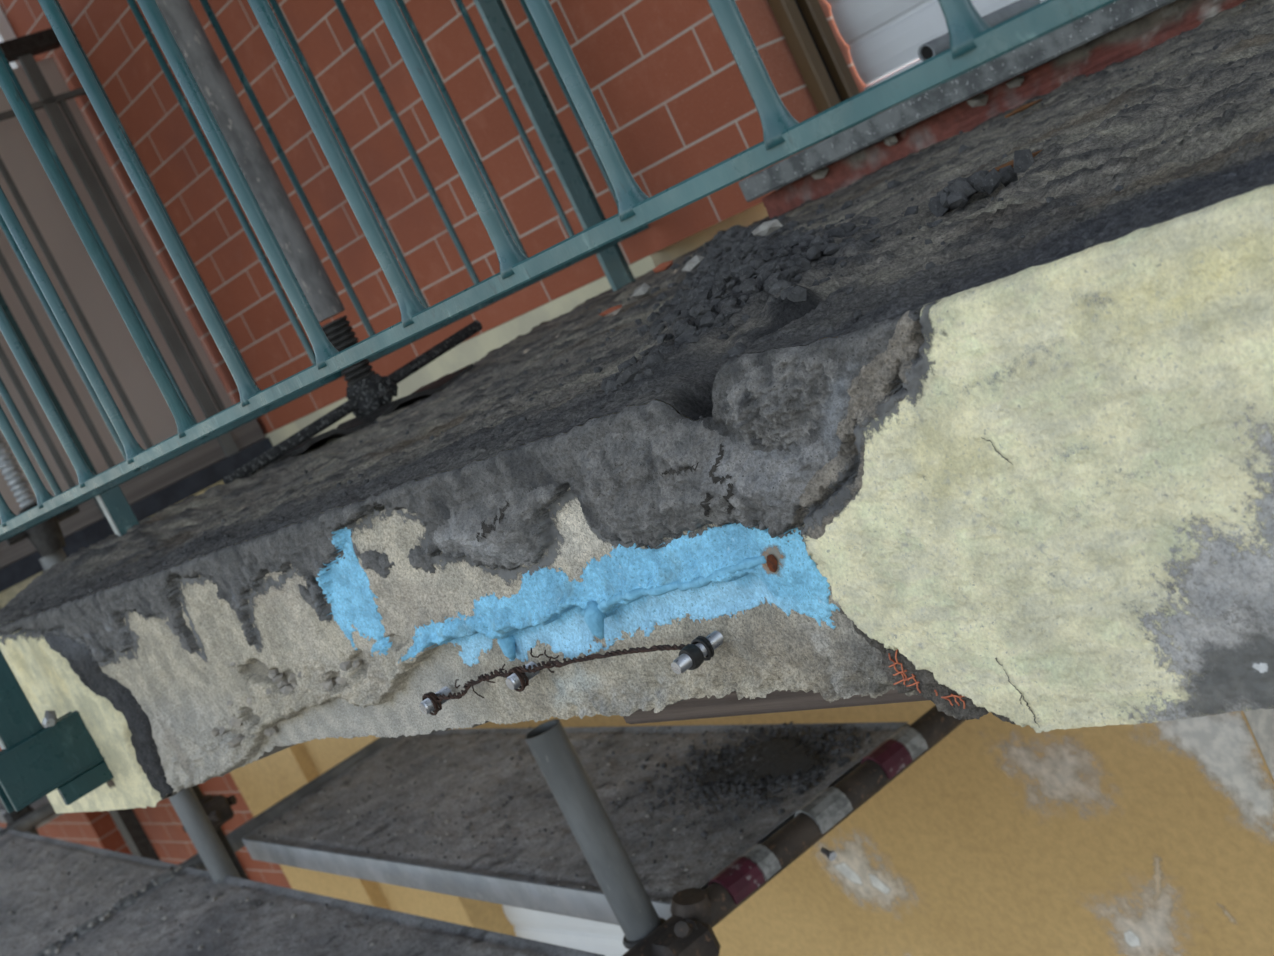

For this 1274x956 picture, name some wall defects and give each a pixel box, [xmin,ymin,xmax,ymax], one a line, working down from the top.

spalling [788,310,925,542]
spalling [42,488,1015,801]
corrosion [762,545,784,574]